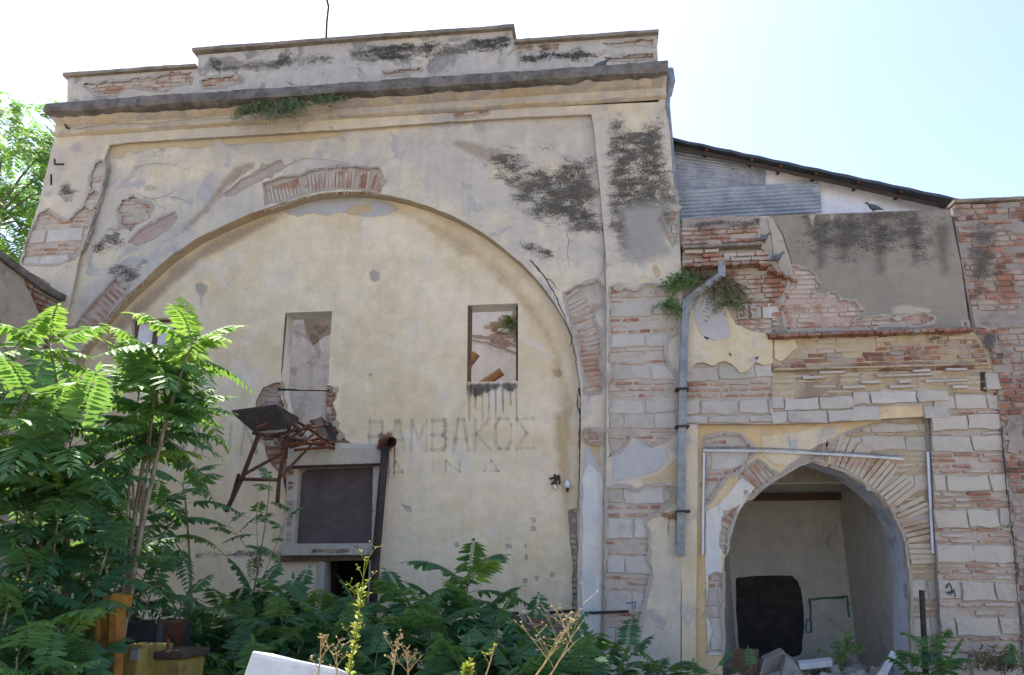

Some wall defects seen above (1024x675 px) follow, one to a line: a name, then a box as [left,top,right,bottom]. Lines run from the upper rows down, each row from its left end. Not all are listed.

water stain [351,36,509,62]
water stain [520,48,597,62]
flaking render [20,131,340,267]
flaking render [222,159,397,217]
water stain [461,120,673,258]
water stain [803,211,931,259]
flaking render [70,276,151,361]
flaking render [778,264,937,332]
water stain [467,383,516,397]
flaking render [260,384,350,541]
flaking render [563,265,680,652]
flaking render [699,418,940,675]